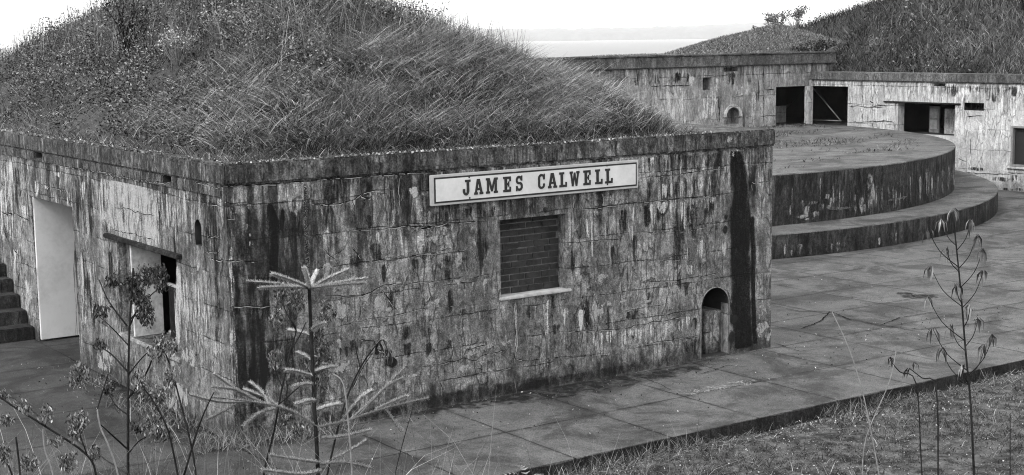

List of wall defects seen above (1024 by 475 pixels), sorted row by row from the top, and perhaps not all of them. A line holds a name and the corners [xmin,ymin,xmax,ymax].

water stain [0,162,48,240]
water stain [67,176,338,434]
water stain [350,200,401,310]
water stain [403,295,431,357]
water stain [409,187,449,225]
water stain [435,229,489,316]
water stain [418,317,701,415]
water stain [545,295,652,344]
water stain [586,211,614,269]
water stain [610,151,757,349]